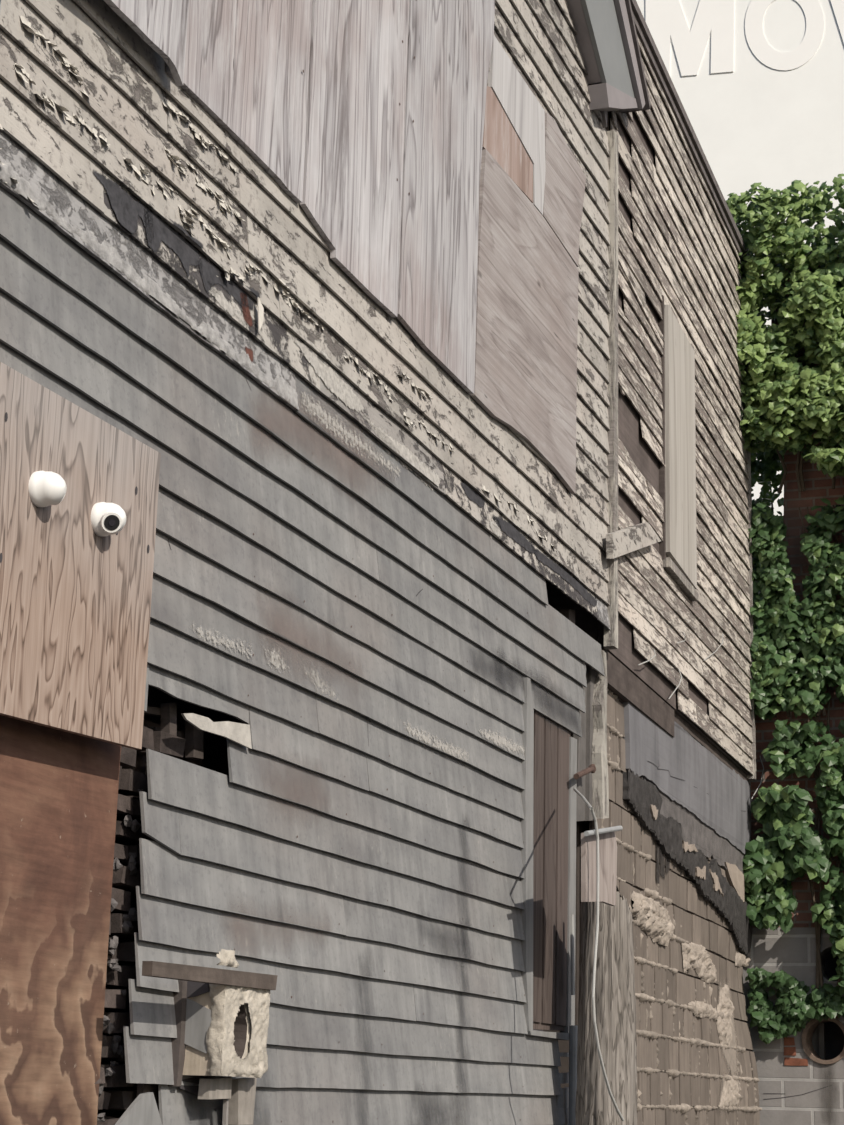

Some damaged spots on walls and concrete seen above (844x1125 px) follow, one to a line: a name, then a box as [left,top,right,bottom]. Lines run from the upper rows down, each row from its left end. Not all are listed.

peeling [19,15,93,101]
peeling [13,63,110,147]
peeling [161,97,236,173]
peeling [0,146,325,411]
peeling [344,355,393,401]
peeling [404,412,455,453]
peeling [481,484,555,548]
flaking render [657,789,745,873]
spalling [632,891,735,1045]
spalling [735,952,751,967]
spalling [718,1078,741,1108]